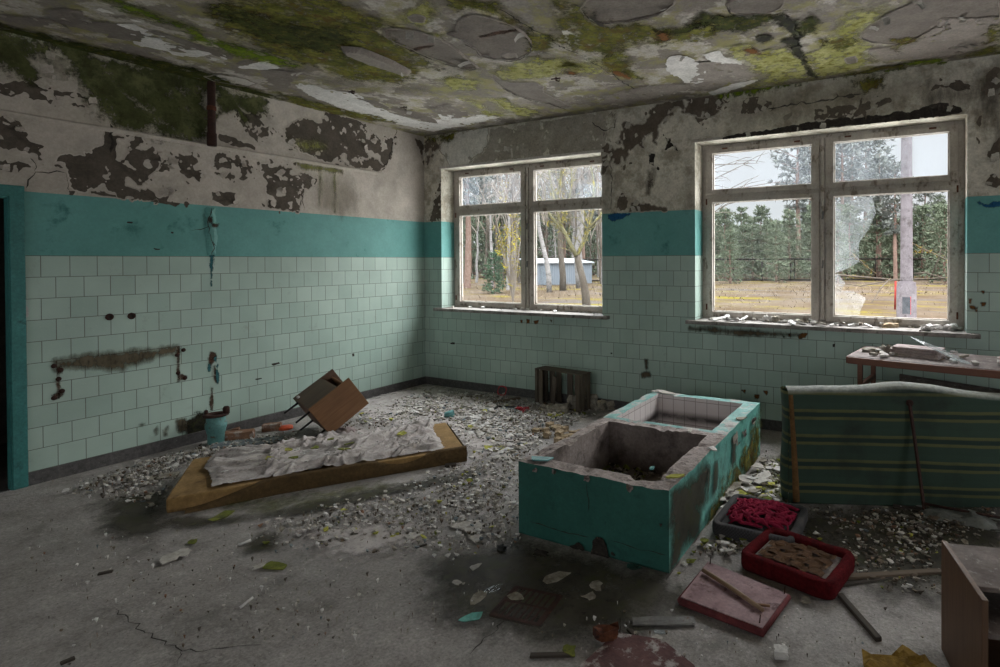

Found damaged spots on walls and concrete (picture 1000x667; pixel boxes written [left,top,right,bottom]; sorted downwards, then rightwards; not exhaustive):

peeling [341,46,411,77]
water stain [755,14,818,78]
peeling [0,115,44,172]
peeling [54,109,397,214]
peeling [415,93,729,175]
peeling [741,97,772,114]
peeling [814,94,892,129]
spalling [902,102,962,120]
peeling [976,115,1000,188]
peeling [430,180,441,222]
peeling [617,193,668,213]
crack [117,610,260,665]